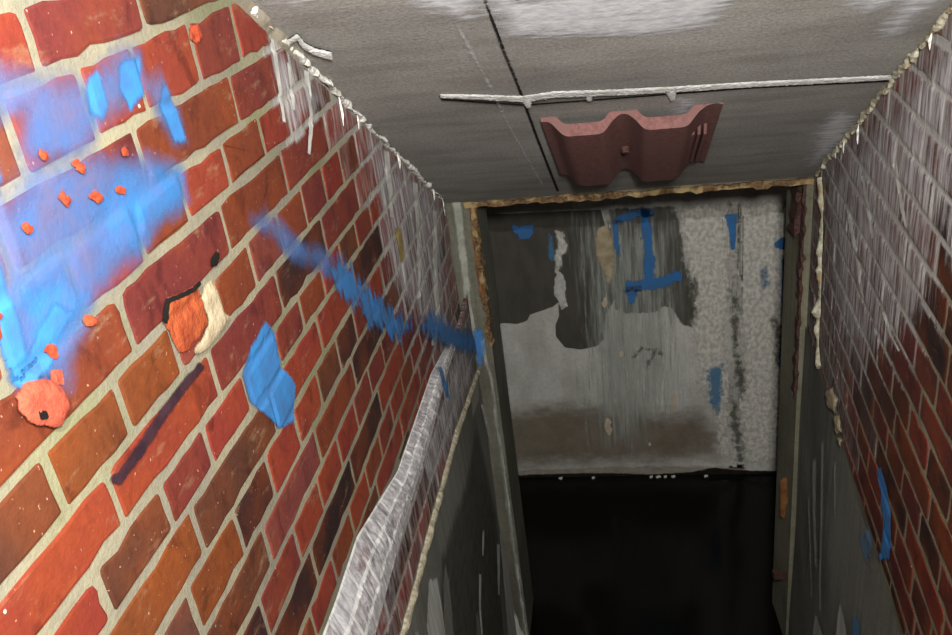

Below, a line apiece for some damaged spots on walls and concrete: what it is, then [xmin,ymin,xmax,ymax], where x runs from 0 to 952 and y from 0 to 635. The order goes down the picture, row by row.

water stain [851,0,935,32]
water stain [263,26,493,631]
water stain [416,404,527,635]
peeling [554,231,567,273]
water stain [487,201,787,478]
water stain [825,388,842,447]
water stain [806,7,952,380]